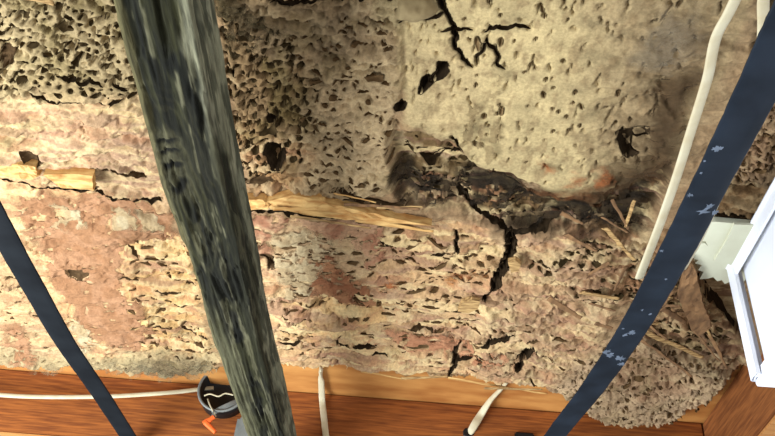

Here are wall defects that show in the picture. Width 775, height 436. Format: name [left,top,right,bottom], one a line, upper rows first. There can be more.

spalling [0,0,137,99]
crack [269,0,364,8]
crack [424,0,531,70]
crack [2,168,162,205]
spalling [219,17,650,304]
crack [419,137,557,302]
crack [408,323,437,334]
crack [448,335,515,377]
spalling [590,295,730,425]